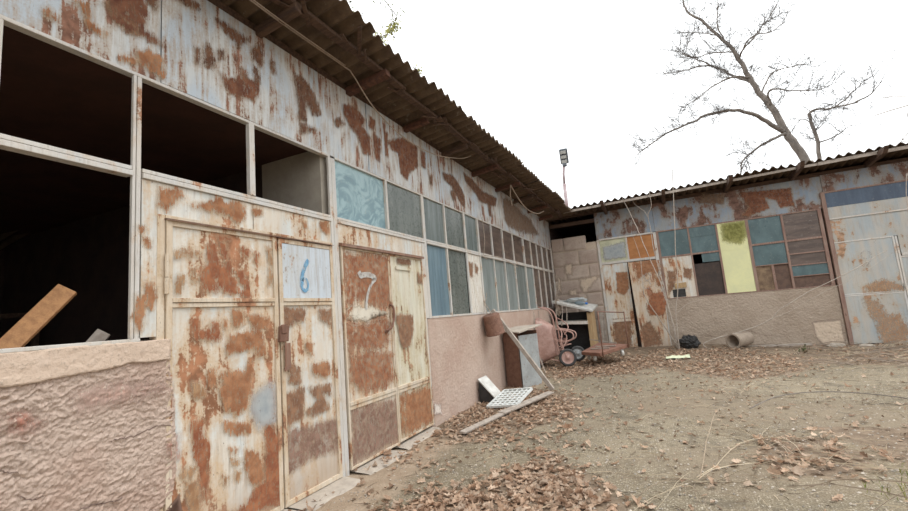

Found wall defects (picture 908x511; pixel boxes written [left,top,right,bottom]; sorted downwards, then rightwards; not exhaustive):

rust [106,0,167,79]
rust [193,42,226,68]
rust [215,17,277,101]
rust [295,72,321,133]
rust [335,104,539,235]
rust [741,188,795,216]
rust [132,282,158,330]
rust [173,233,274,298]
rust [613,259,692,347]
rust [319,248,435,464]
rust [190,306,338,511]
rust [181,419,212,511]